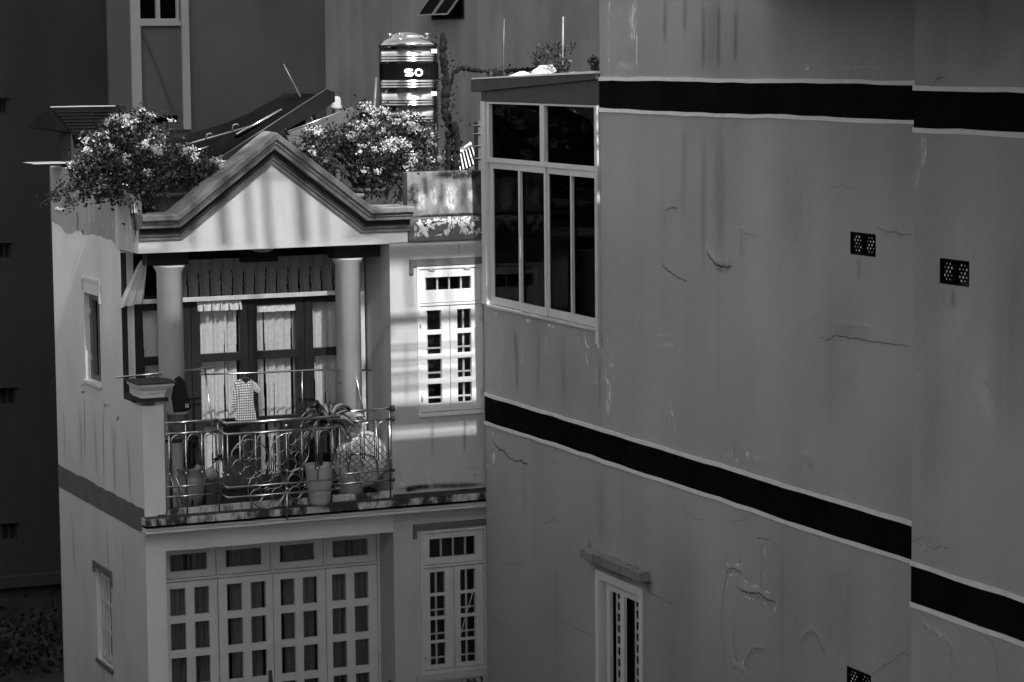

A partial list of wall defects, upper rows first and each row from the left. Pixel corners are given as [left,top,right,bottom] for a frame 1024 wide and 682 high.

water stain [438,170,481,193]
water stain [409,187,479,217]
crack [822,335,907,347]